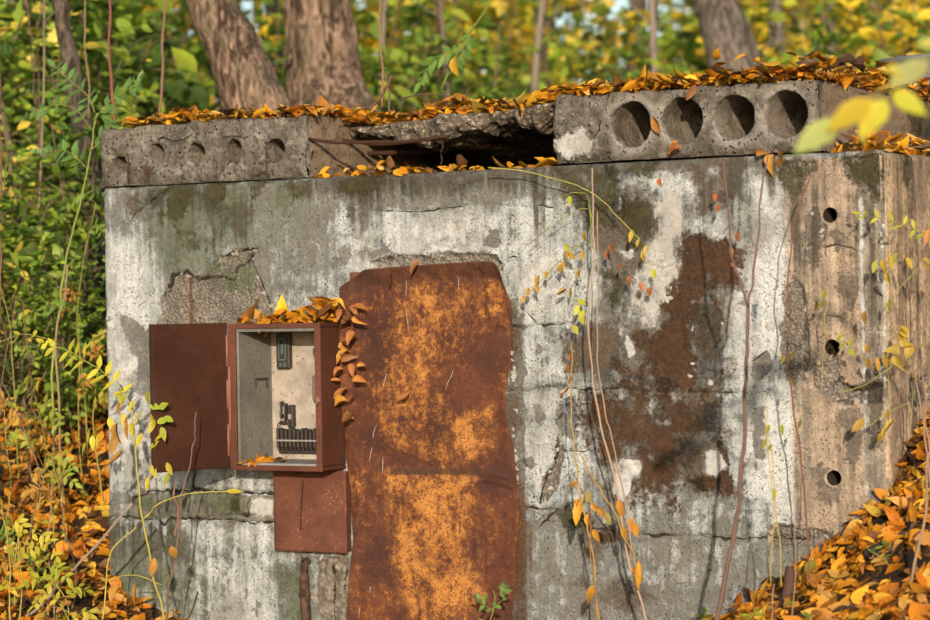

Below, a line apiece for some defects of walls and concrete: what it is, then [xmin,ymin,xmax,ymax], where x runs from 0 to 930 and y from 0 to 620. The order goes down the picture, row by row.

water stain [789,187,820,267]
spalling [106,247,274,397]
water stain [847,195,887,384]
water stain [861,365,870,429]
rust [514,483,533,601]
crack [525,506,570,529]
spalling [310,552,350,620]